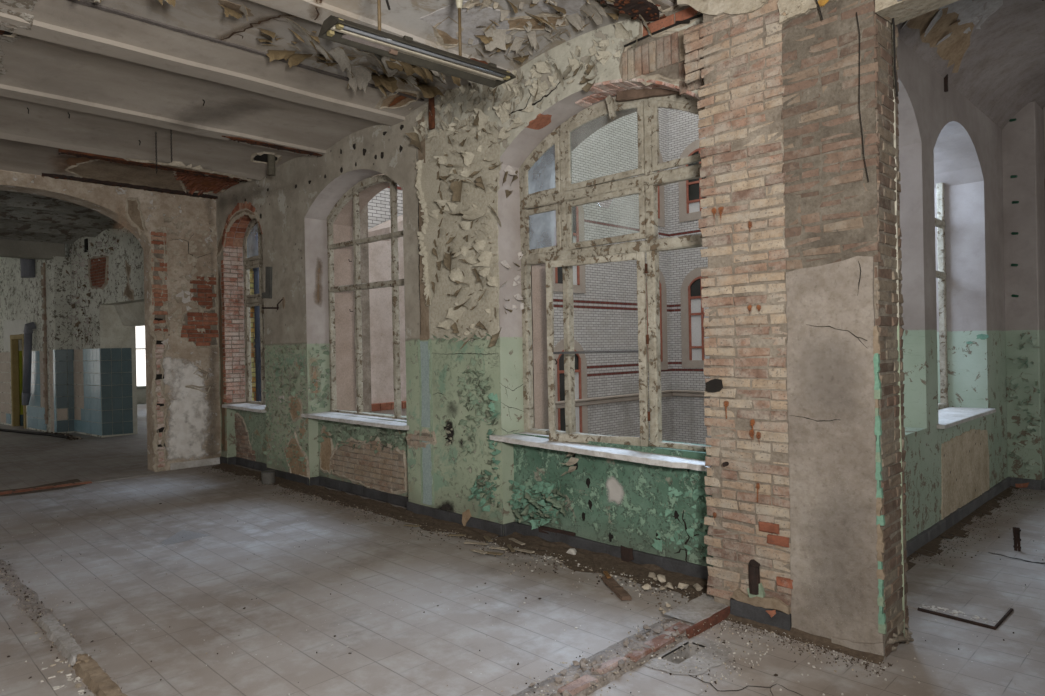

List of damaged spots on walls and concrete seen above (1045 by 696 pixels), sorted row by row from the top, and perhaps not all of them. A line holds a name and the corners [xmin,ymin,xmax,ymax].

flaking render [901,2,987,75]
peeling [256,0,705,349]
flaking render [64,158,437,494]
peeling [457,358,579,530]
flaking render [607,478,623,502]
peeling [652,468,712,558]
flaking render [941,429,989,520]
crack [689,675,803,696]